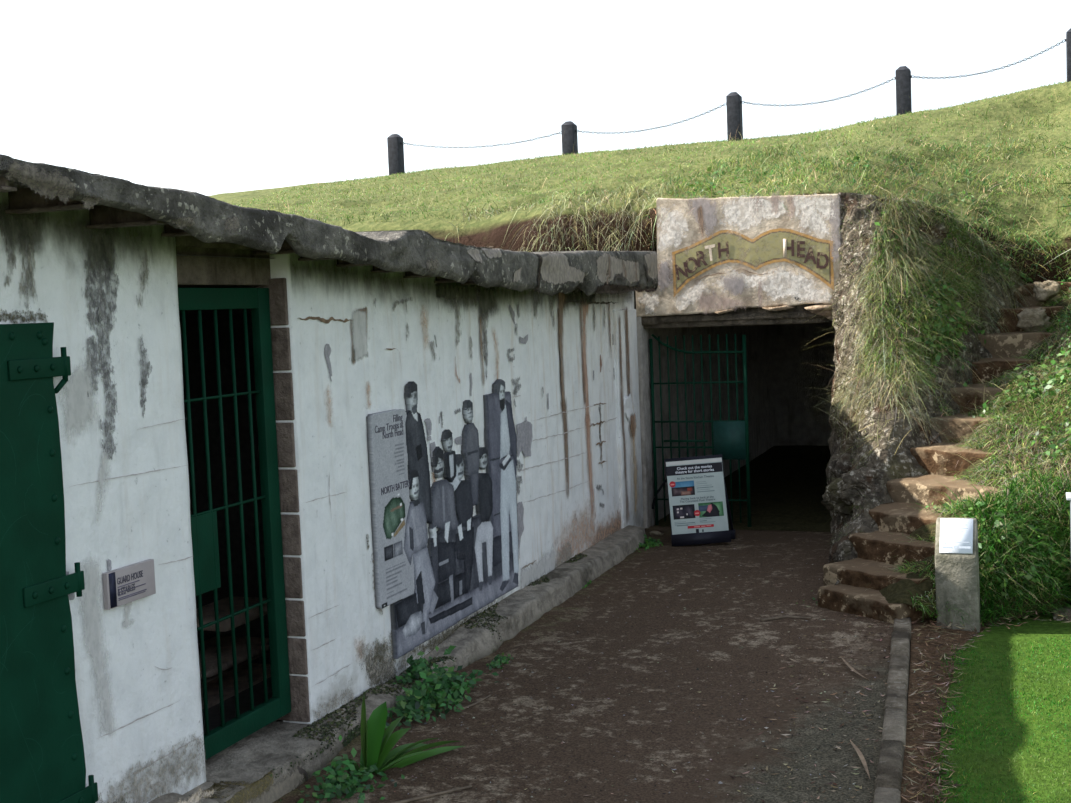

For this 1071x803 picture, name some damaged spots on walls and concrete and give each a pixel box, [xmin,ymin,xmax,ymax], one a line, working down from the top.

damp [0,203,176,310]
crack [300,310,357,324]
rust [580,295,594,512]